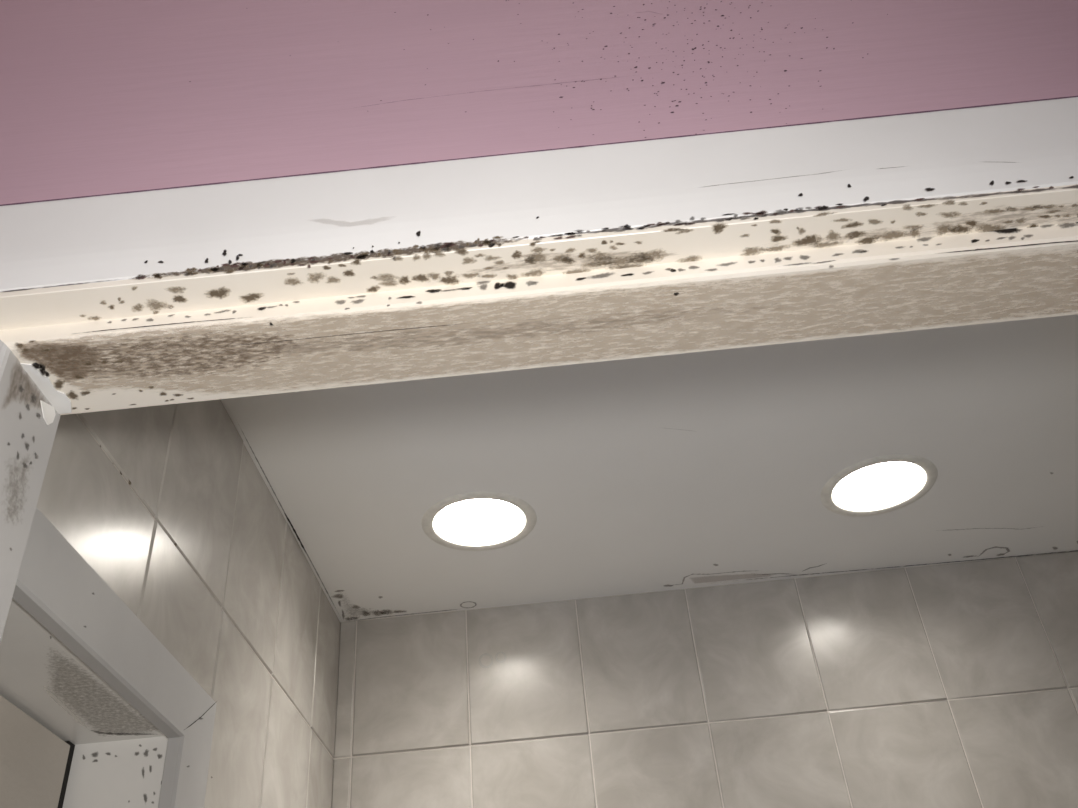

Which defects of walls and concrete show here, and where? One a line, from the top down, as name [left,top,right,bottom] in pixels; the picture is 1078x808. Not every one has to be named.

damp [8,176,1078,418]
damp [92,730,162,776]